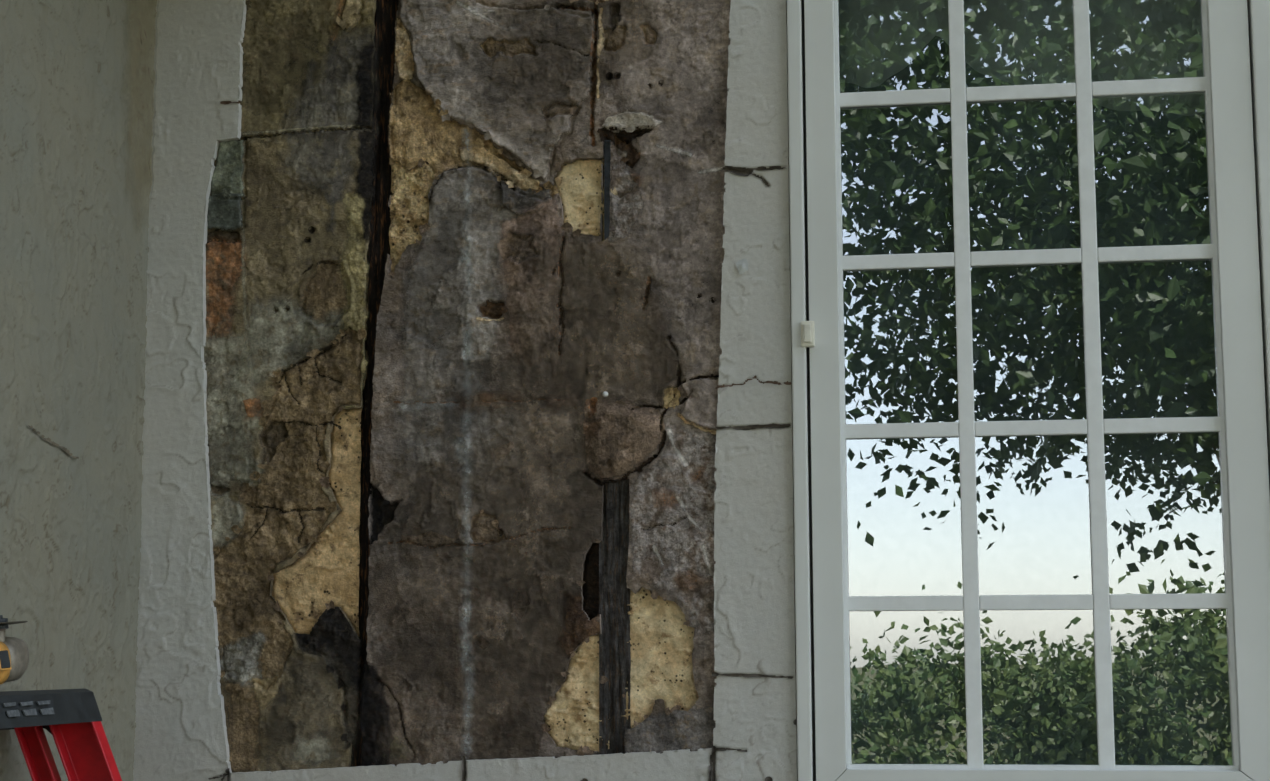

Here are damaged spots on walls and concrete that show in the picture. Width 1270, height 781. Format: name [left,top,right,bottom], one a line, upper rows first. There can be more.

peeling [336,0,362,30]
peeling [389,0,623,215]
peeling [597,109,663,168]
crack [721,166,785,187]
spalling [207,228,240,243]
spalling [479,300,508,319]
crack [583,341,792,486]
peeling [665,378,719,429]
spalling [210,327,366,684]
spalling [369,483,402,545]
spalling [576,539,601,620]
peeling [577,745,595,756]